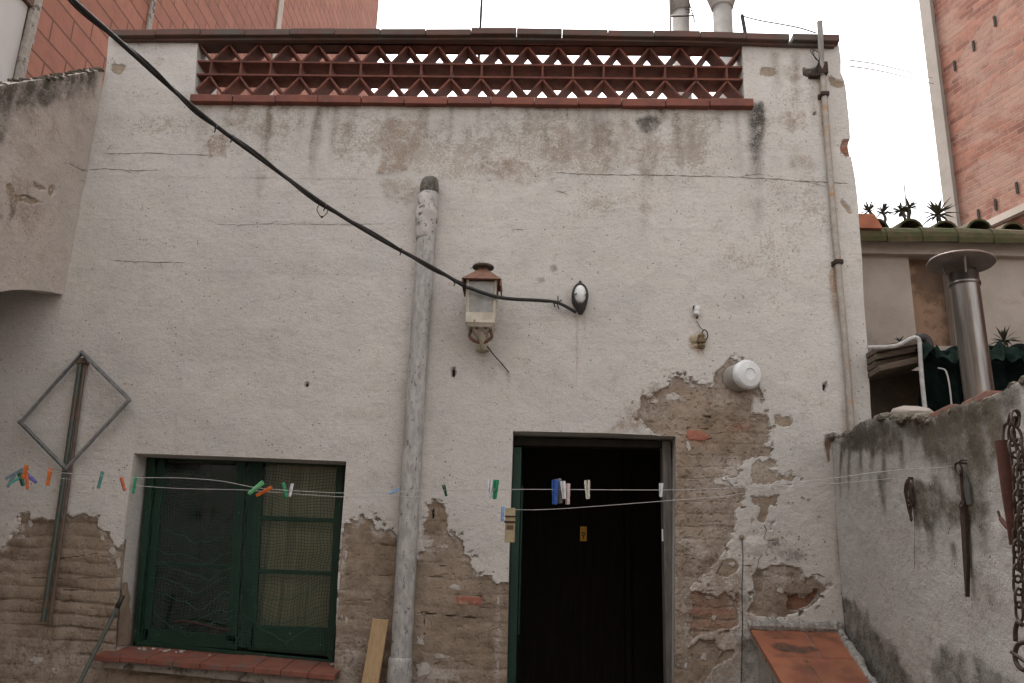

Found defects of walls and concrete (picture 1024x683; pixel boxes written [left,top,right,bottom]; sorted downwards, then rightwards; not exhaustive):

crack [71,147,216,173]
crack [556,172,848,194]
leakage [752,102,764,160]
spalling [0,513,255,683]
spalling [334,515,397,683]
spalling [412,499,509,683]
spalling [618,358,826,683]
leakage [842,599,908,683]
leakage [840,386,1018,540]